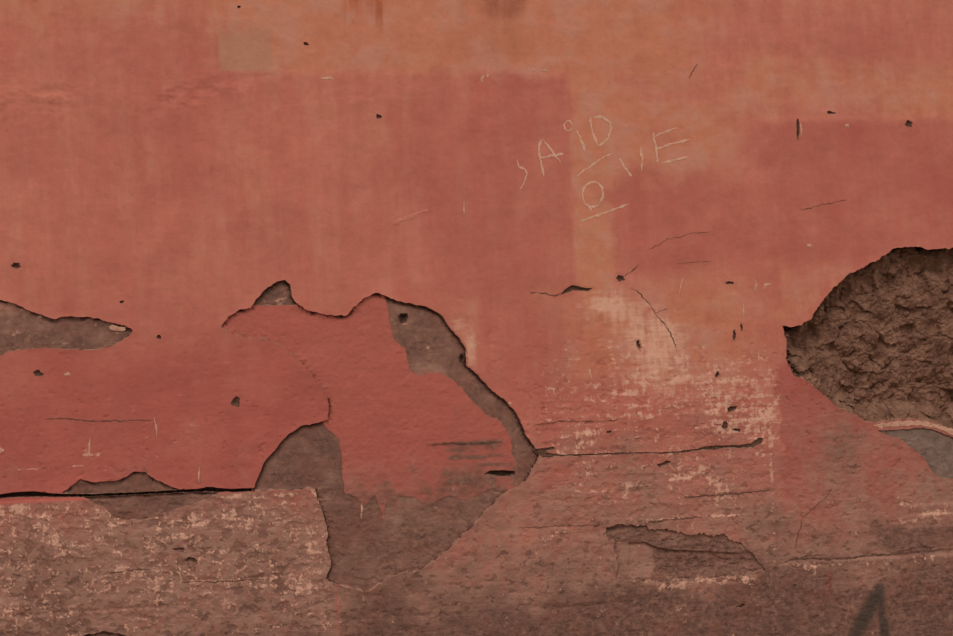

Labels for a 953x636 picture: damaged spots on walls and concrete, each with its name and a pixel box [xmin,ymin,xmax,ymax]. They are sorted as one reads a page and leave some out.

peeling [0,300,133,356]
spalling [782,246,953,479]
peeling [221,280,539,592]
crack [532,418,763,457]
crack [0,487,255,499]
peeling [62,467,219,520]
spalling [603,524,765,585]